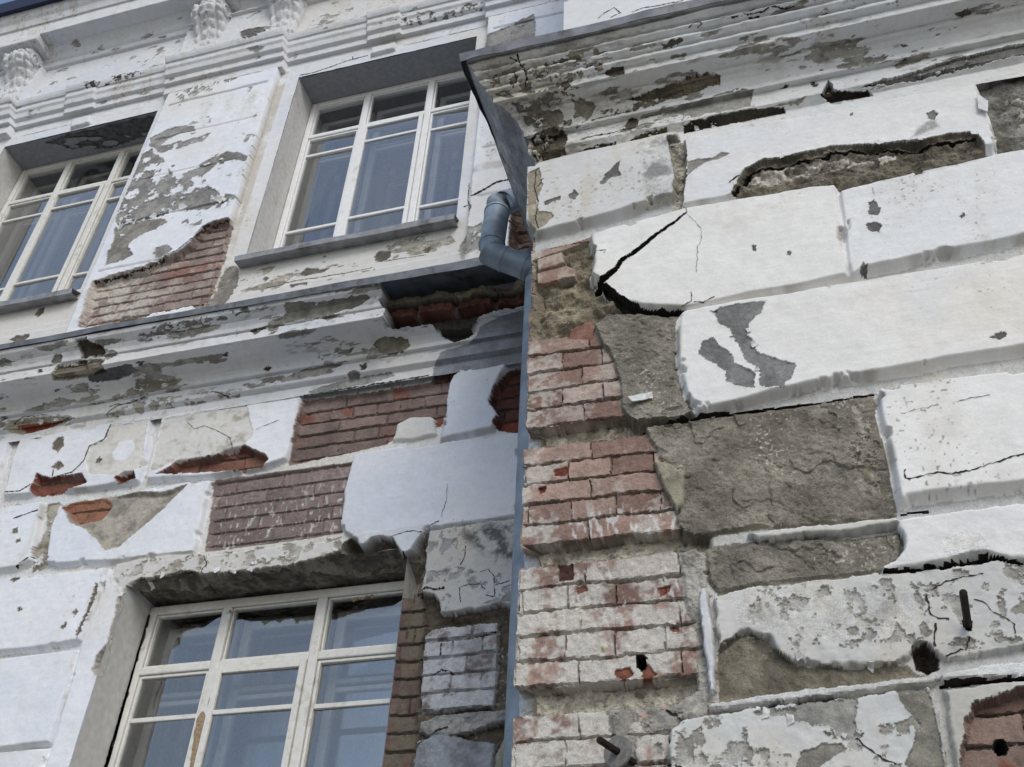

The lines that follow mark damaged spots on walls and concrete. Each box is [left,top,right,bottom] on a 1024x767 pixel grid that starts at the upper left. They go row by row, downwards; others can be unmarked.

peeling [485,0,1024,250]
crack [595,207,714,318]
spalling [0,116,525,767]
spalling [529,242,971,767]
crack [904,453,1024,480]
crack [878,552,1024,689]
peeling [947,558,1024,652]
spalling [958,685,1024,767]